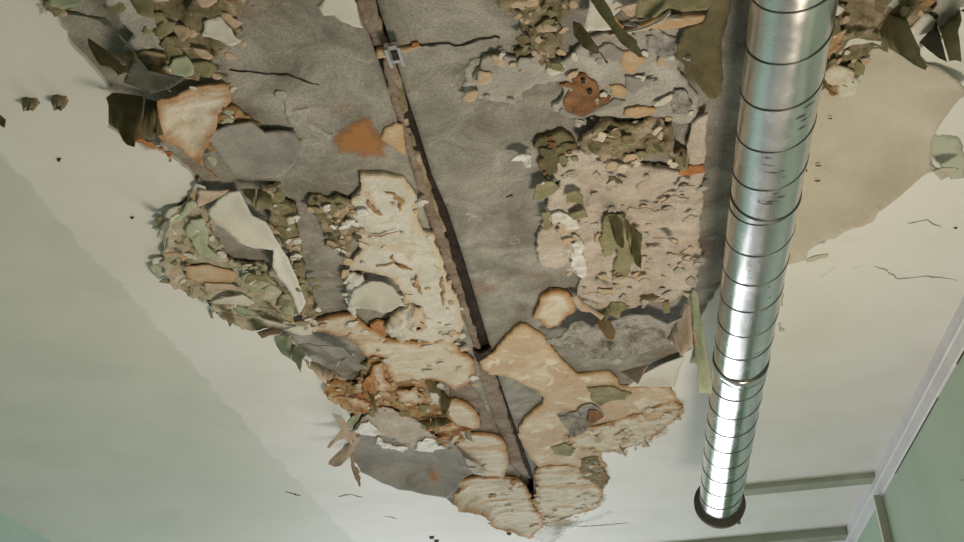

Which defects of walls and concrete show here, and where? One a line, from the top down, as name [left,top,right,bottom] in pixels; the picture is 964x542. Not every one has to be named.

flaking render [822,0,962,98]
spalling [43,0,430,383]
spalling [377,0,750,384]
crack [874,266,958,281]
peeling [350,392,399,430]
spalling [418,310,494,477]
spalling [498,375,543,431]
spalling [489,444,560,539]
spalling [557,401,685,512]